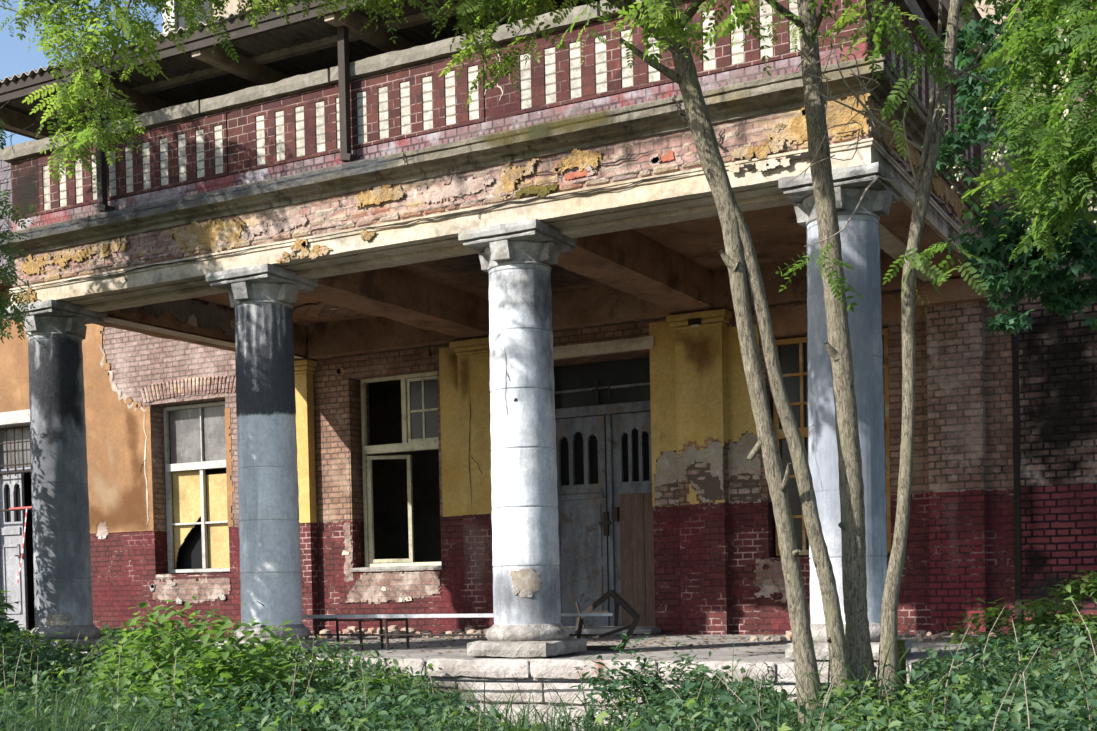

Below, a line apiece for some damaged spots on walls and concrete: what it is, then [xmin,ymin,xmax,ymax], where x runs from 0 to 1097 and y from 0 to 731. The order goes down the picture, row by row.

flaking render [354,158,540,208]
flaking render [552,148,602,181]
flaking render [729,107,809,173]
flaking render [825,93,921,176]
flaking render [21,236,129,275]
flaking render [170,214,332,264]
leakage [235,303,284,354]
flaking render [98,298,240,526]
flaking render [313,350,441,604]
flaking render [654,431,762,507]
flaking render [510,568,542,597]
spalling [753,558,787,602]